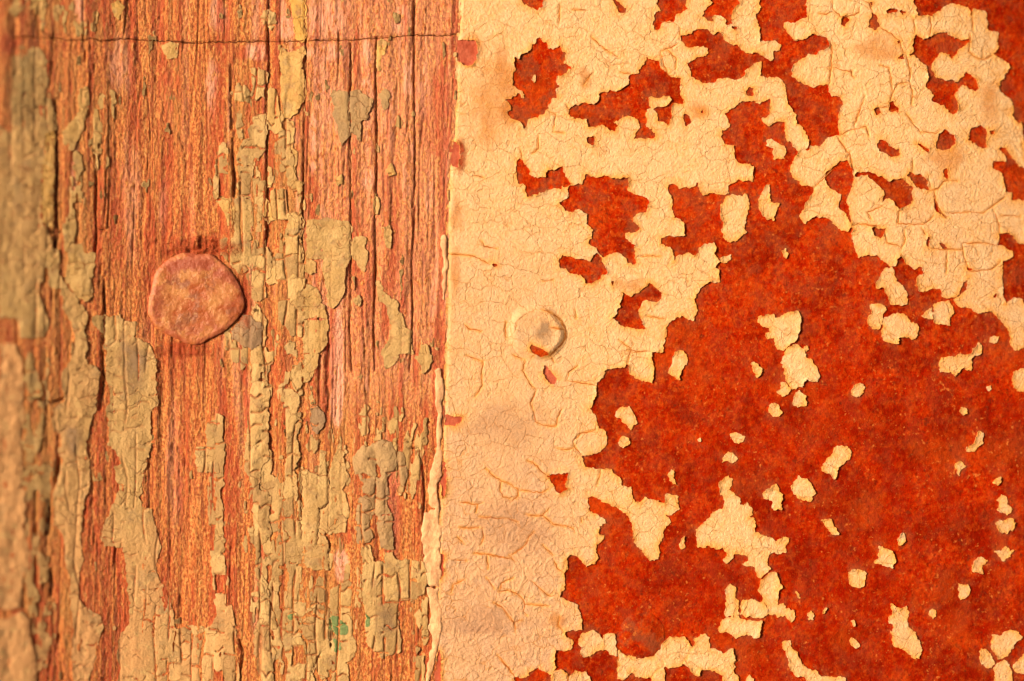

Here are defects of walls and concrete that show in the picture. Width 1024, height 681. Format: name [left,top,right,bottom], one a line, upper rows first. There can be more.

peeling [9,0,99,37]
peeling [111,0,125,20]
peeling [148,31,179,59]
crack [813,0,939,191]
crack [853,159,1021,272]
peeling [0,45,240,681]
peeling [208,0,462,681]
crack [464,322,596,454]
crack [544,310,596,386]
peeling [506,0,1024,681]
crack [426,460,582,630]